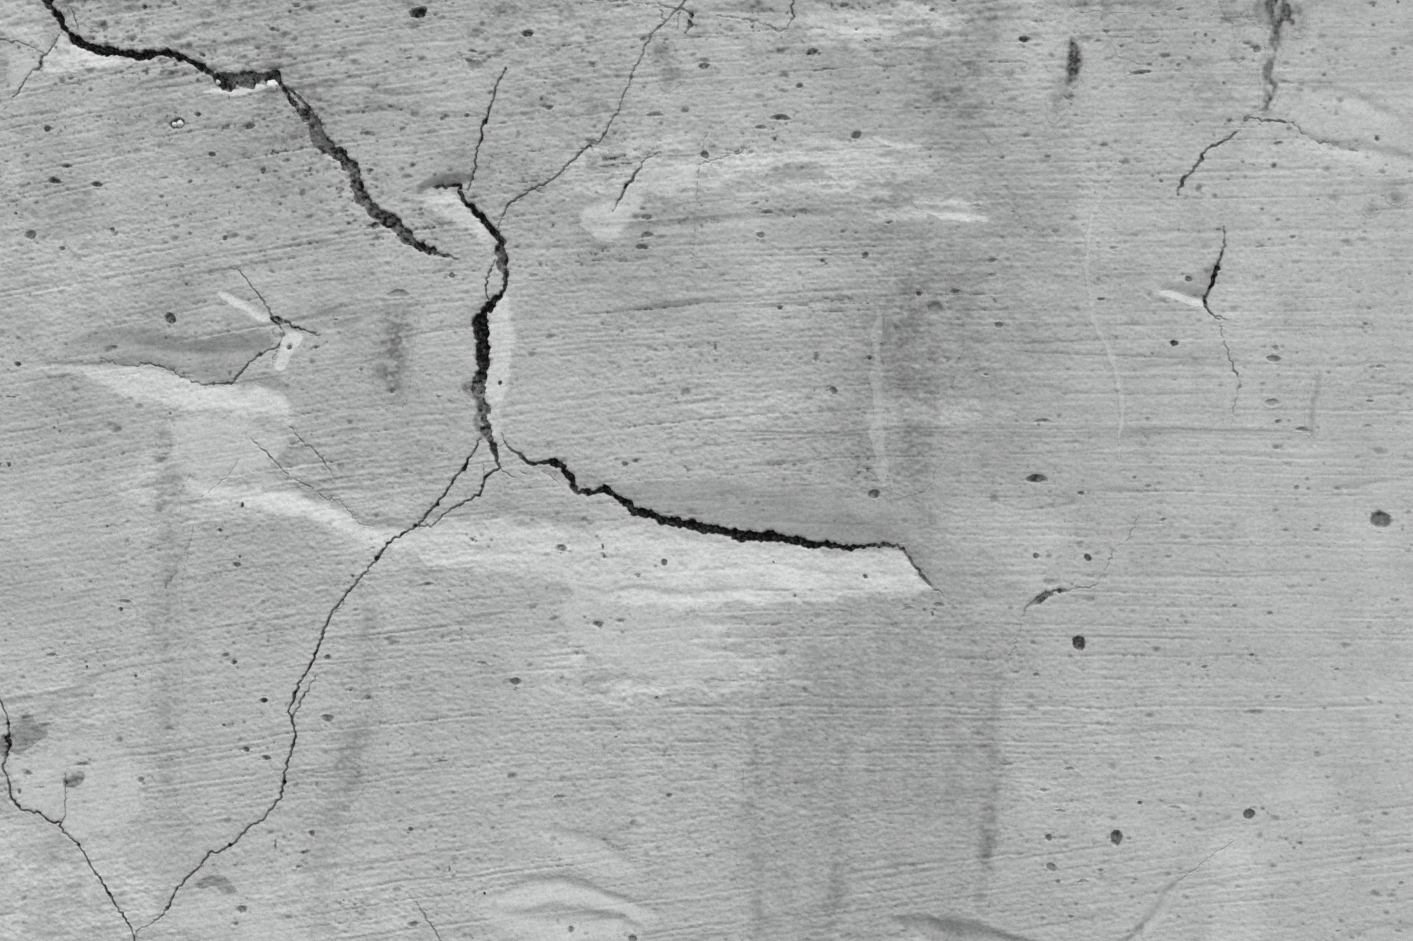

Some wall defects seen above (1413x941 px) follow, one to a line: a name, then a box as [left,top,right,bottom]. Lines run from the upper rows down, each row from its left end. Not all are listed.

leakage [1219,0,1287,115]
crack [1174,96,1359,198]
crack [1200,224,1244,418]
crack [0,0,945,941]